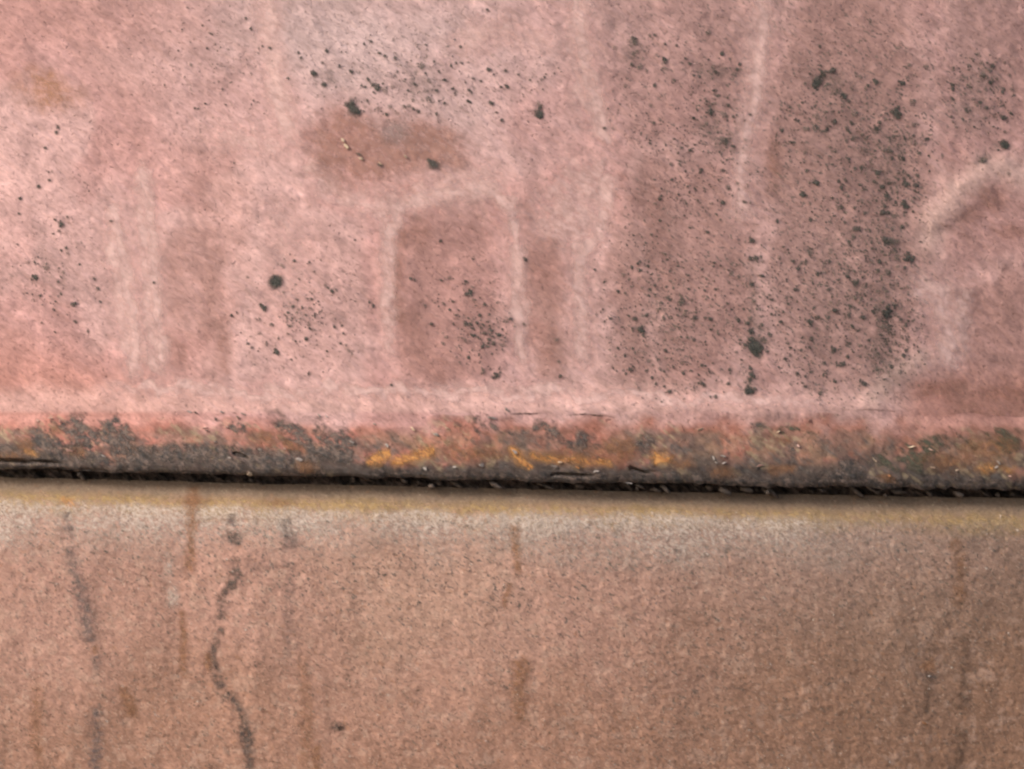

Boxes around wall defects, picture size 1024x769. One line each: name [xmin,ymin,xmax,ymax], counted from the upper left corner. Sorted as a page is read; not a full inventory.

leakage [93,0,971,409]
mould [12,256,89,334]
rust [367,448,434,465]
rust [510,444,631,470]
rust [653,451,670,464]
leakage [222,560,240,596]
leakage [210,614,253,769]